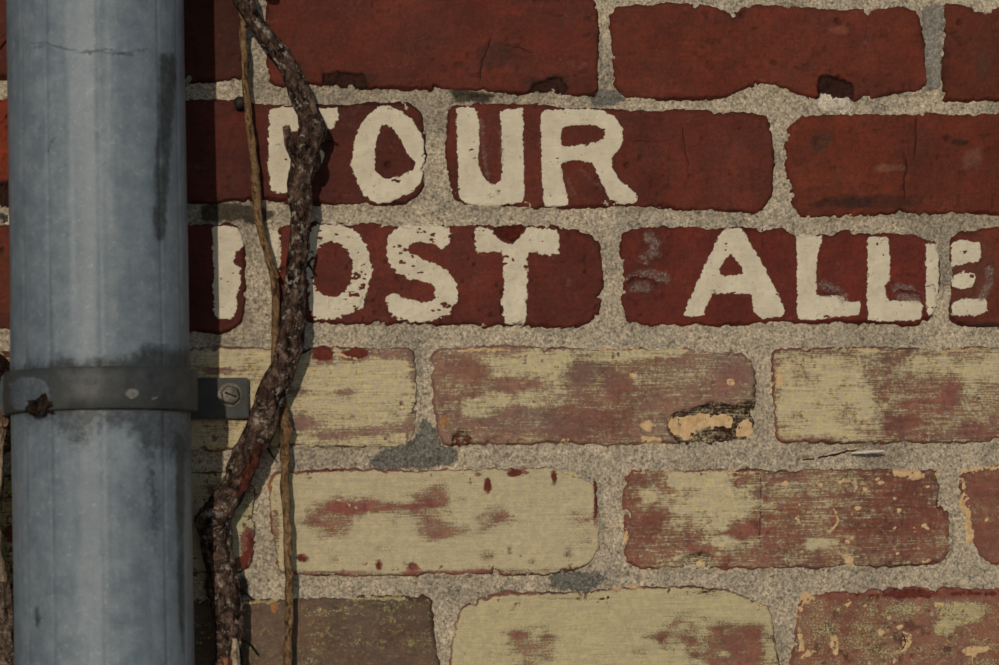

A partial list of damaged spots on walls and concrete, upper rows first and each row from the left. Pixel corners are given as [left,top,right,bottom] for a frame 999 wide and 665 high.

peeling [434,347,756,447]
peeling [629,469,950,569]
peeling [958,464,999,544]
peeling [294,595,436,665]
peeling [451,585,779,665]
peeling [795,588,999,665]